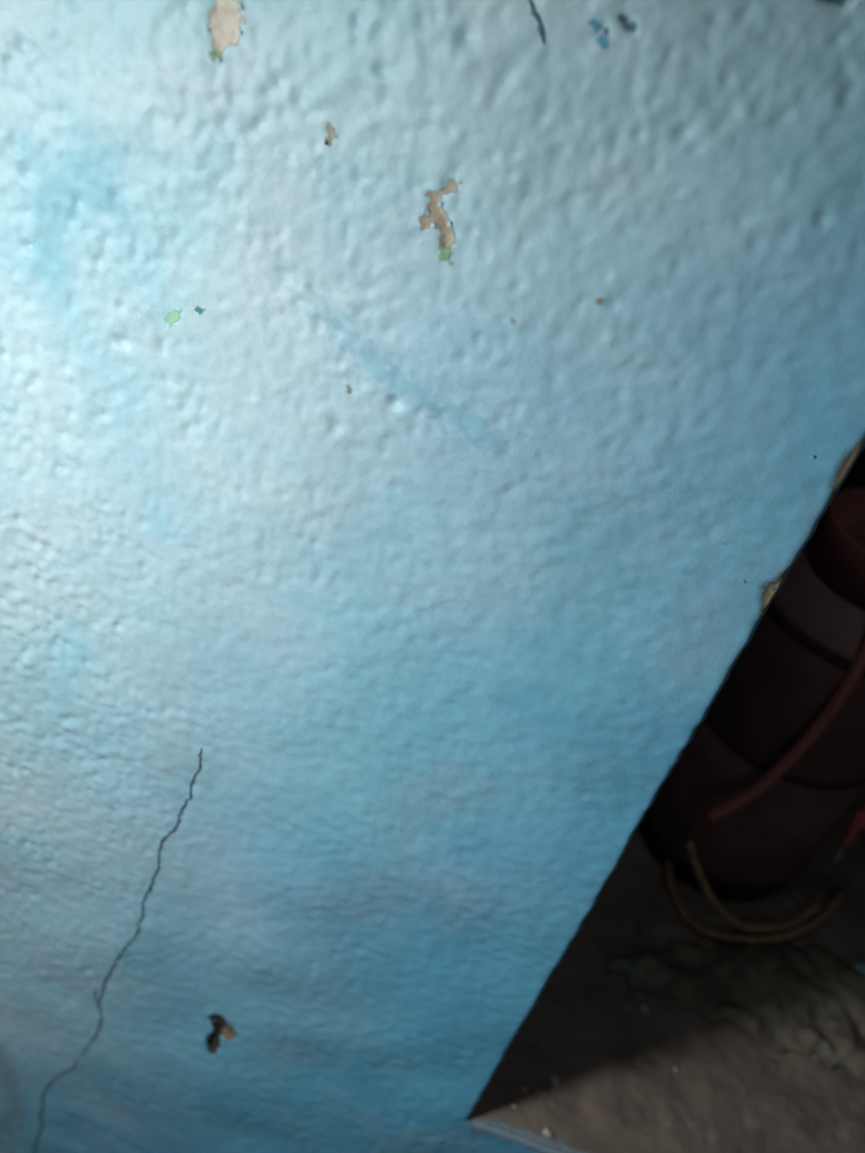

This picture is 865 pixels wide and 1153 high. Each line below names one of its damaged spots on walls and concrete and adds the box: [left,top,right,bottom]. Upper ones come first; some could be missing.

peeling [205,0,245,63]
peeling [324,123,337,146]
peeling [419,179,461,264]
crack [33,748,202,1153]
spalling [206,1014,237,1054]